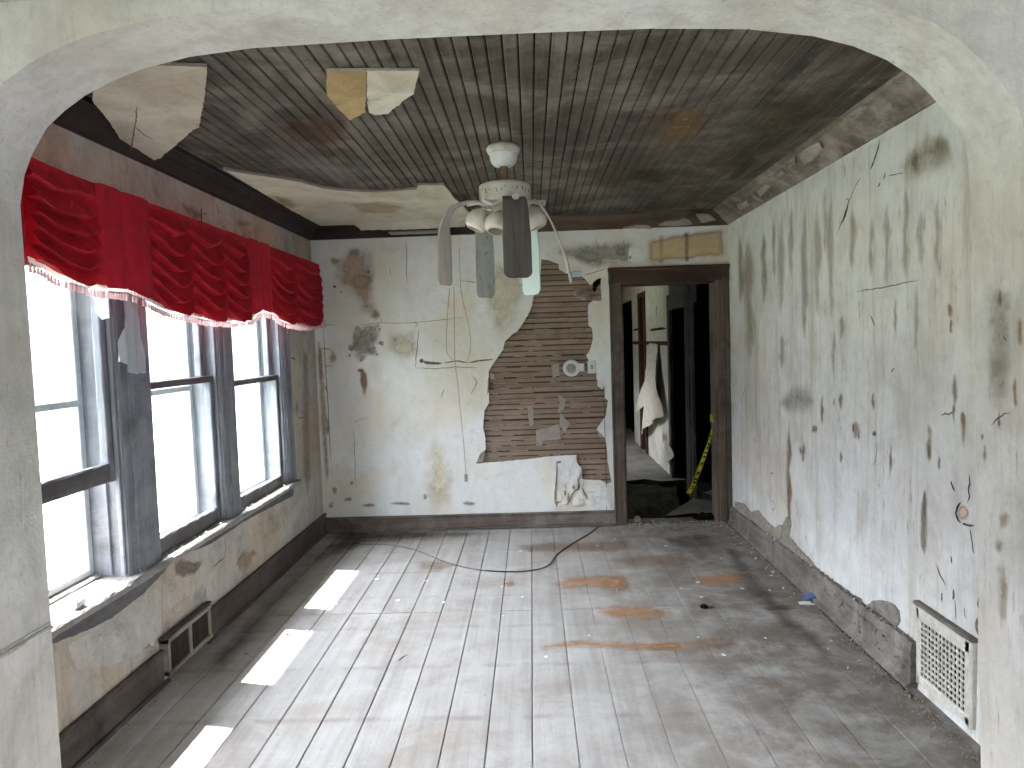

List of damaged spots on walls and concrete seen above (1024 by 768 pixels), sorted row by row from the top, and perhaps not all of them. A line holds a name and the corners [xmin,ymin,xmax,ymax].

crack [131,107,153,151]
crack [837,141,903,233]
crack [857,280,918,292]
flaking render [415,260,611,483]
flaking render [735,502,815,566]
flaking render [850,593,901,627]